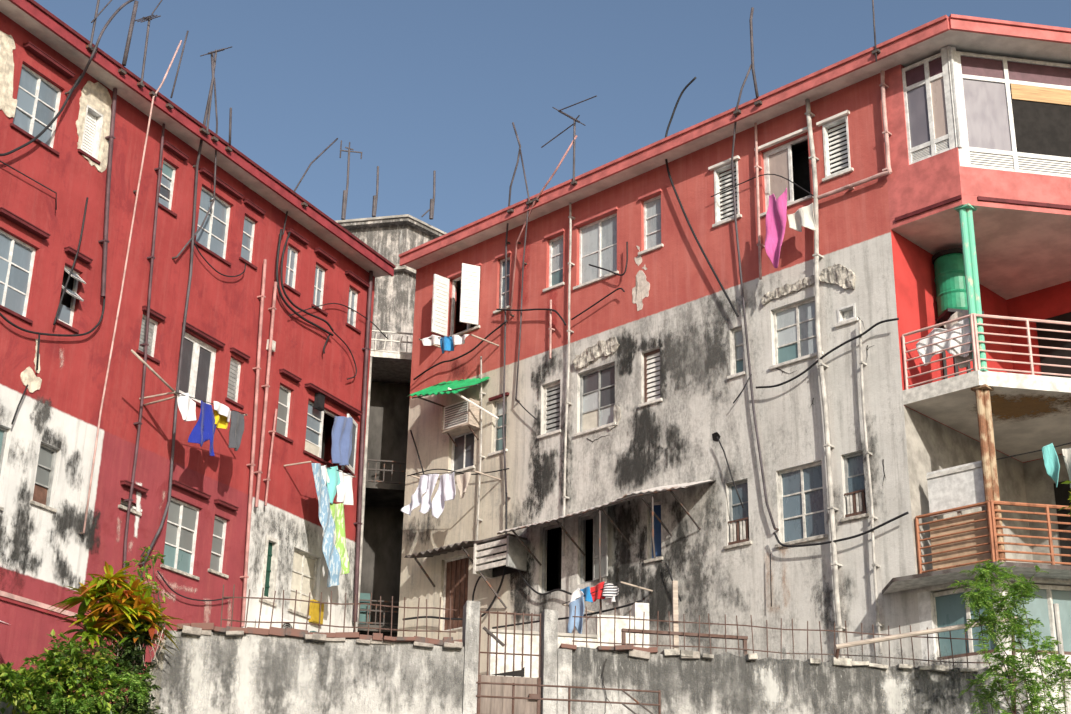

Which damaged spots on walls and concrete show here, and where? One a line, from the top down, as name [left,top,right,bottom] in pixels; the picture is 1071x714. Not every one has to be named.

flaking render [0,31,17,118]
flaking render [76,81,112,172]
peeling [632,246,650,311]
leakage [617,298,746,399]
leakage [31,400,64,449]
leakage [0,482,42,585]
leakage [50,500,100,588]
leakage [509,349,572,623]
leakage [607,405,735,654]
leakage [225,634,260,714]
leakage [755,668,783,706]
leakage [858,668,908,714]